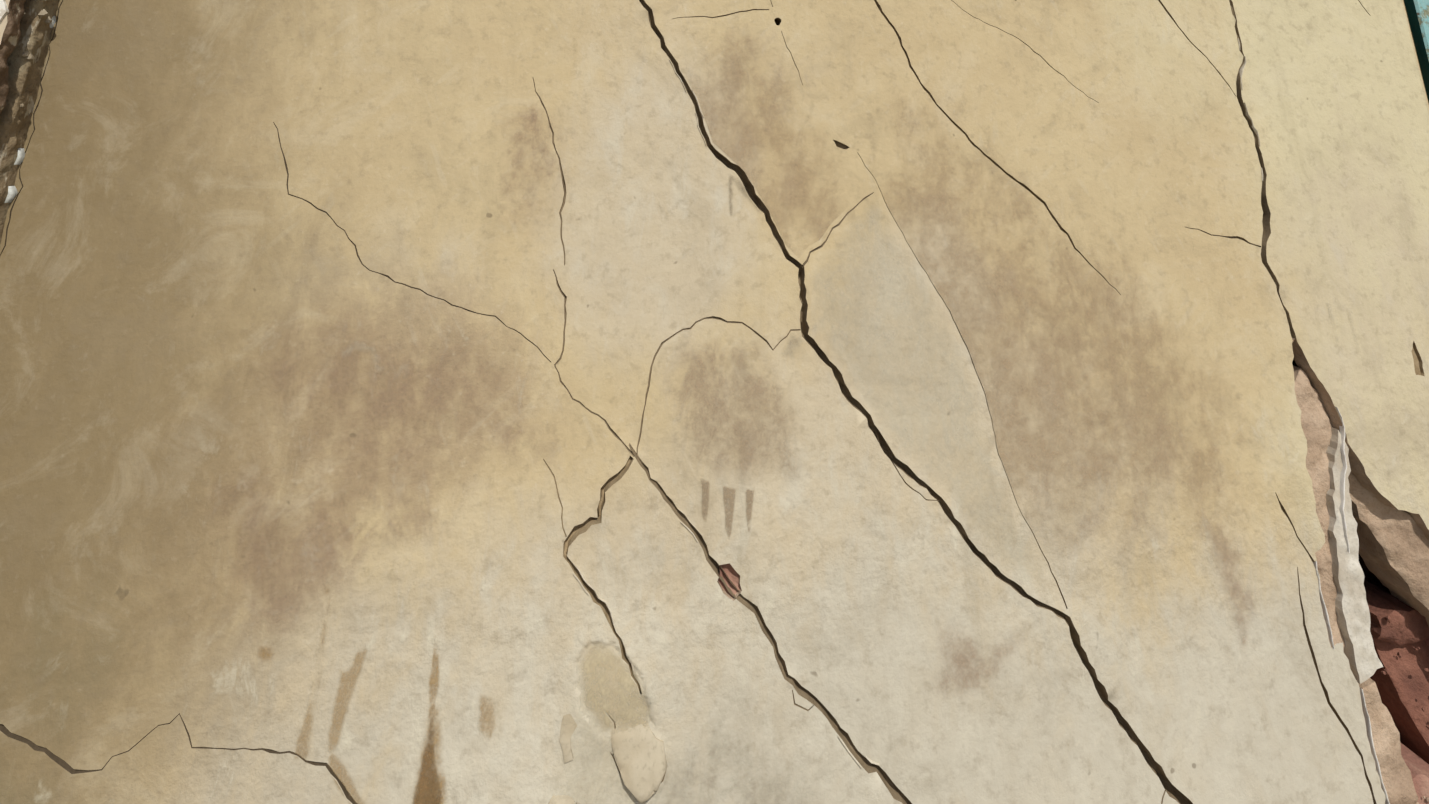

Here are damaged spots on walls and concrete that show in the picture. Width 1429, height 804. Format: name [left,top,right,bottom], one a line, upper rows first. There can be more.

spalling [0,0,59,244]
crack [0,0,63,256]
crack [1158,0,1297,340]
crack [273,0,1193,804]
crack [0,713,358,804]
peeling [560,713,577,763]
peeling [584,650,667,804]
crack [1275,492,1377,804]
spalling [1292,338,1429,804]